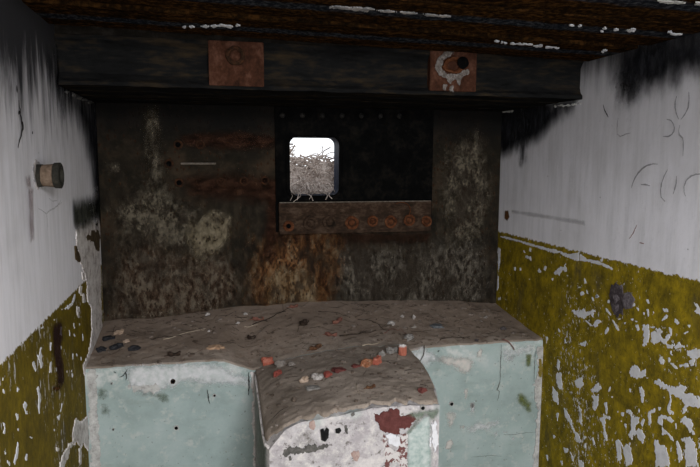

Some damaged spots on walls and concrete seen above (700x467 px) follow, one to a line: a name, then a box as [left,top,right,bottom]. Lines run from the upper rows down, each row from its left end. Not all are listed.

peeling [435,51,469,92]
damp [74,198,101,229]
corrosion [253,234,340,306]
peeling [500,236,613,281]
peeling [32,342,57,373]
flaking render [56,218,102,467]
spalling [572,278,700,369]
peeling [374,408,453,467]
flaking render [504,337,548,467]
peeling [552,360,700,467]